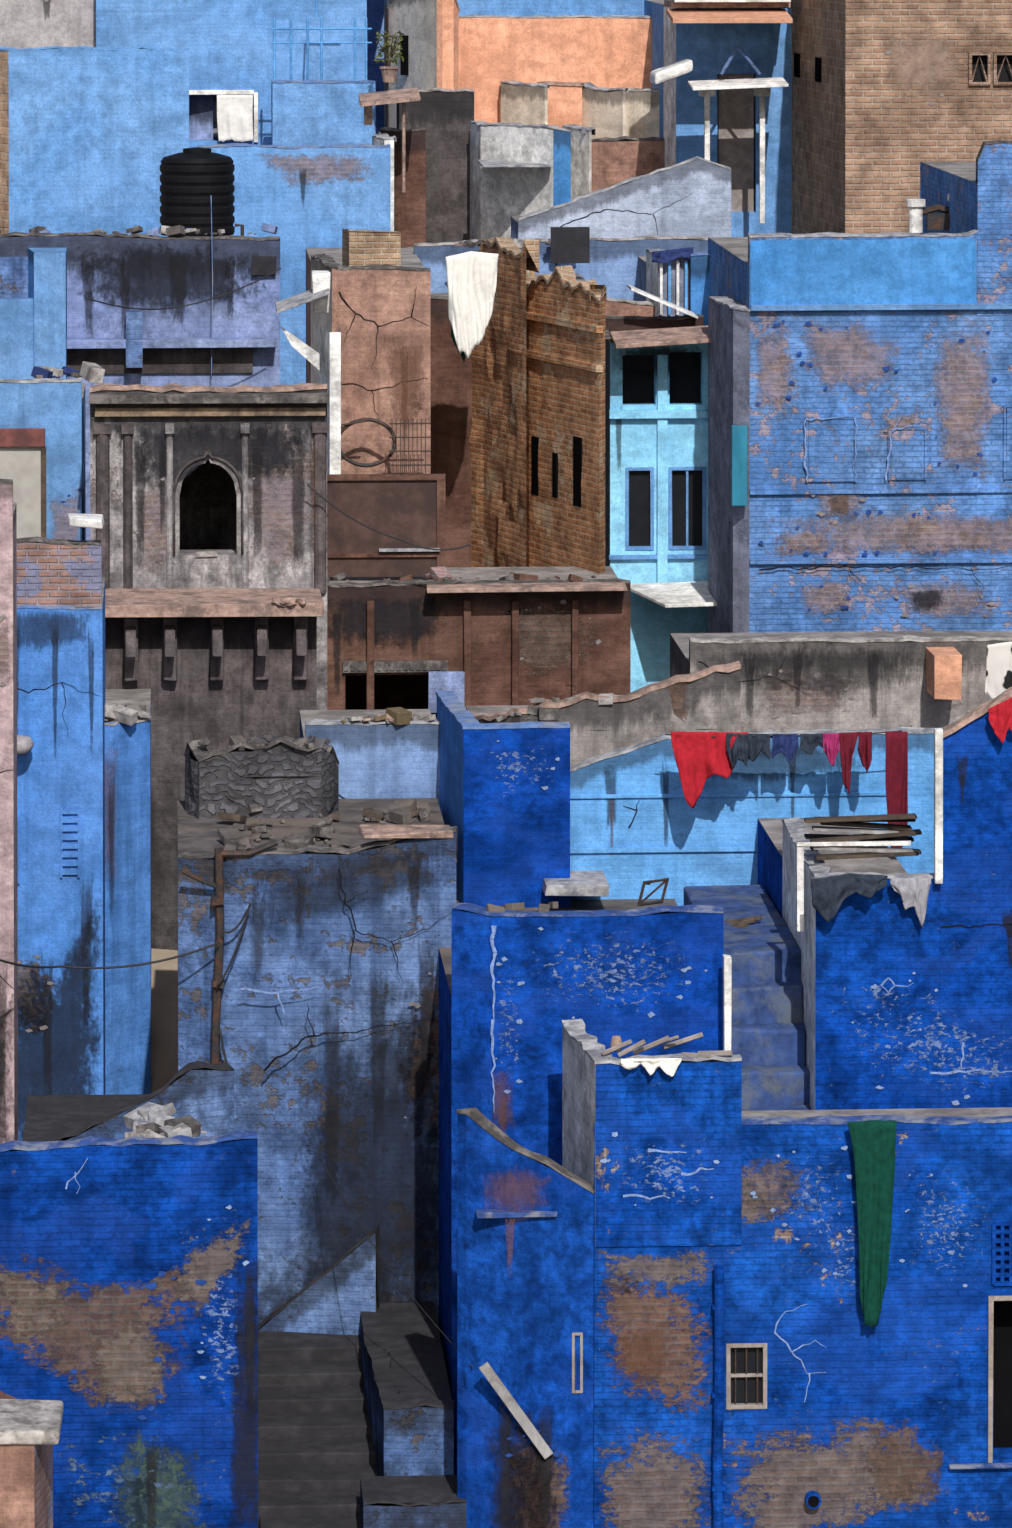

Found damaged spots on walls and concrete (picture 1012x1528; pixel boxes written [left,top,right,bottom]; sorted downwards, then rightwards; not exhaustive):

crack [339,286,427,418]
spalling [755,320,900,407]
spalling [933,325,997,476]
spalling [781,494,1012,556]
spalling [892,579,995,617]
crack [240,869,451,1071]
crack [489,926,497,1107]
spalling [742,1146,858,1295]
peeling [899,1174,983,1273]
peeling [0,1205,250,1421]
flaking render [595,1249,951,1528]
crack [774,1304,826,1403]